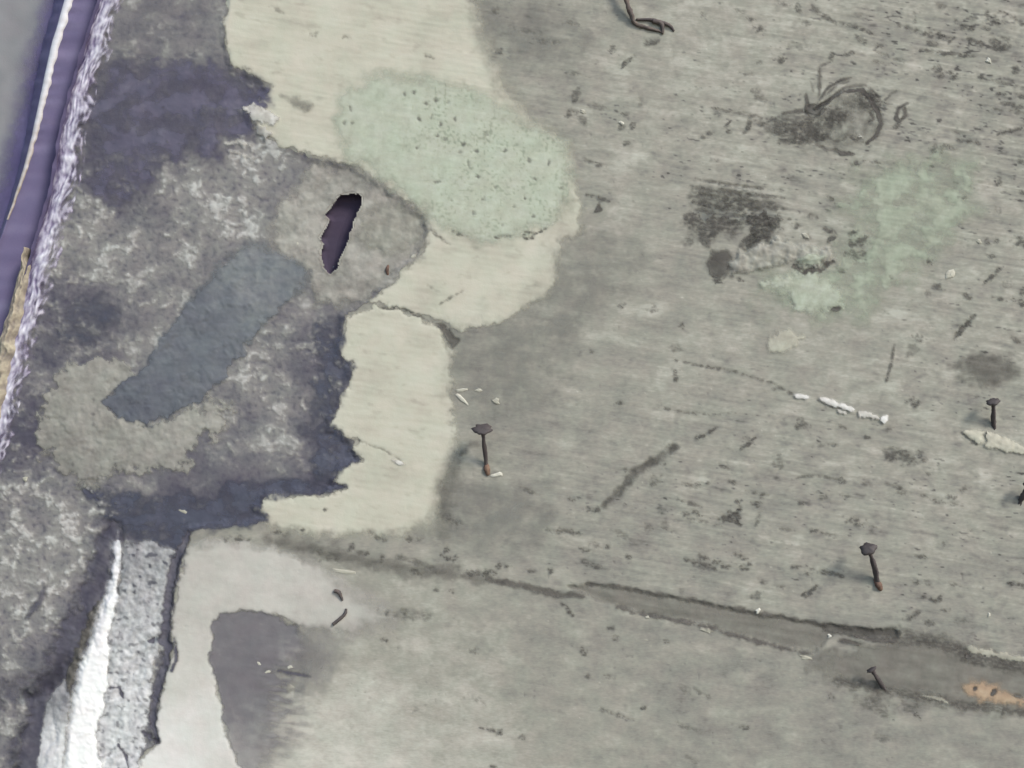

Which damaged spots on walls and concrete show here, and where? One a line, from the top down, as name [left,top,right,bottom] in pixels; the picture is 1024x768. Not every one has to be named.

damp [334,70,569,242]
damp [692,181,791,248]
spalling [0,0,582,768]
damp [208,610,333,768]
corrosion [963,682,1024,706]